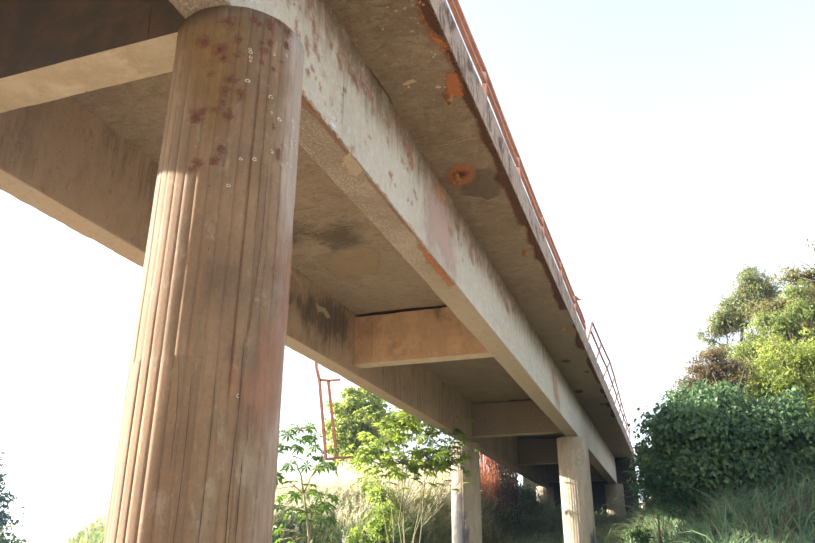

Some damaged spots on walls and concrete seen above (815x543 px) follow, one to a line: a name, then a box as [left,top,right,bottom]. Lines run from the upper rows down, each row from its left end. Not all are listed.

rust [251,0,320,74]
rust [443,71,464,98]
spalling [301,90,424,244]
leakage [416,0,566,310]
rust [419,244,454,285]